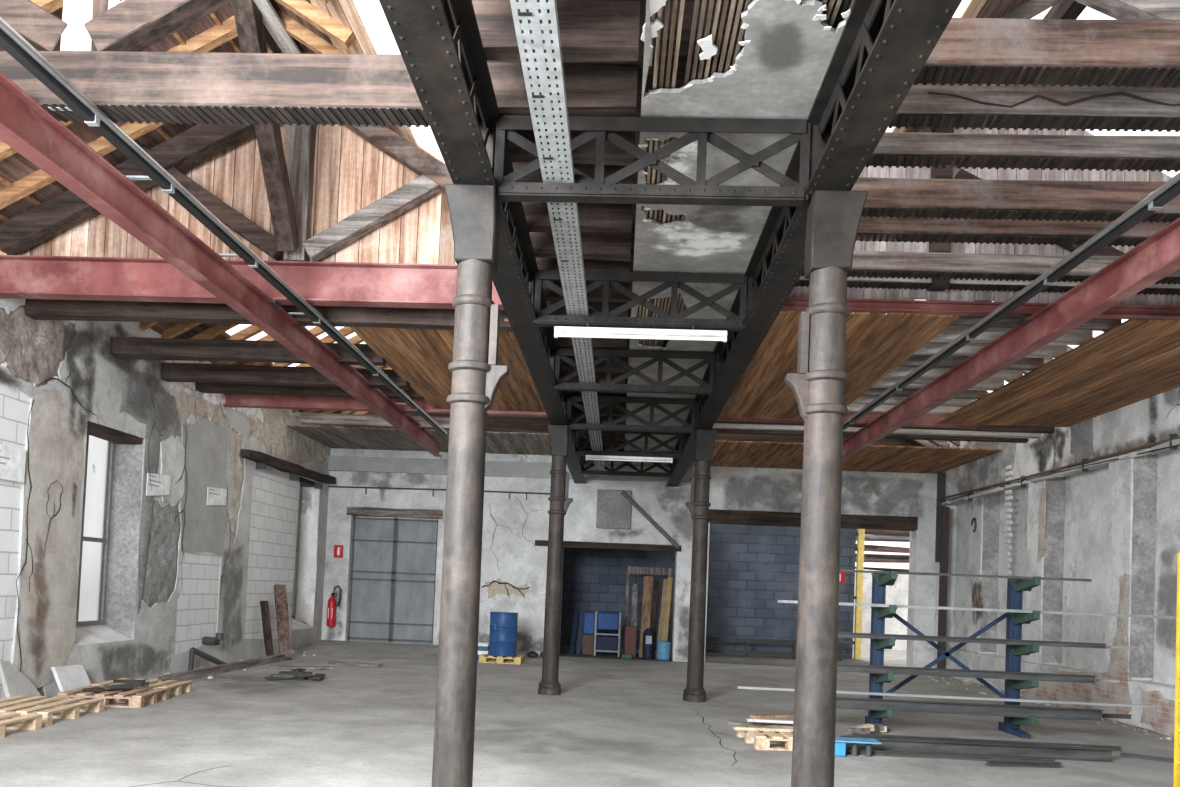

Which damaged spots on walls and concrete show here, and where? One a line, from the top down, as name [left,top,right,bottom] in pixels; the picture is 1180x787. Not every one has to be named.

peeling [641,0,751,90]
damp [761,24,797,67]
peeling [812,0,855,31]
crack [928,91,1180,108]
damp [654,205,746,257]
spalling [0,305,76,387]
spalling [171,382,327,540]
crack [16,363,97,672]
spalling [142,501,181,607]
crack [694,709,737,766]